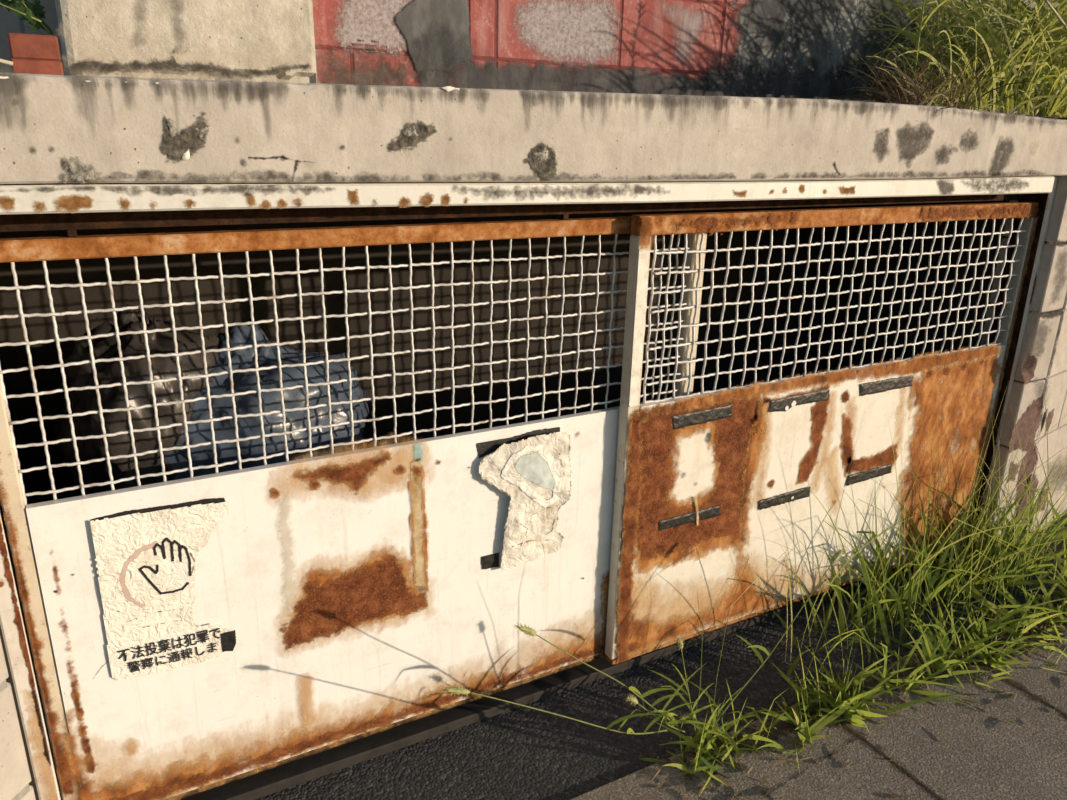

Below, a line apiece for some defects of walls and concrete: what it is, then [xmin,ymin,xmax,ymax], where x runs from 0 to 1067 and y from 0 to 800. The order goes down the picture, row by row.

peeling [335,0,409,57]
damp [322,29,473,92]
damp [703,0,912,112]
spalling [160,112,209,163]
spalling [387,121,437,152]
spalling [524,143,558,181]
damp [874,124,977,164]
mould [989,140,1013,177]
rust [0,196,15,210]
rust [34,195,92,213]
rust [348,189,359,205]
rust [0,203,1039,800]